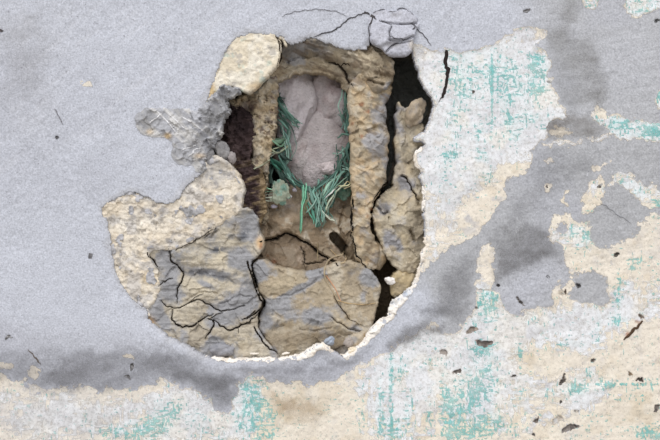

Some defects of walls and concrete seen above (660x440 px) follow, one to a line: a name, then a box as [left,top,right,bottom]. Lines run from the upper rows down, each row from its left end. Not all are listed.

crack [285,7,450,101]
crack [147,229,277,352]
crack [260,232,339,266]
peeling [0,160,660,440]
crack [350,197,366,268]
spalling [102,26,660,363]